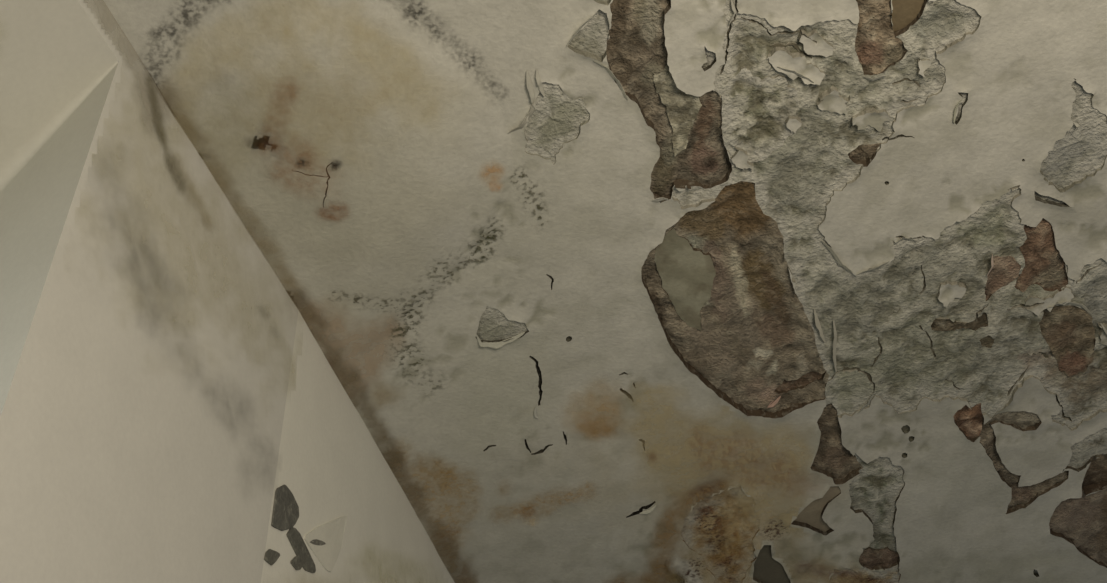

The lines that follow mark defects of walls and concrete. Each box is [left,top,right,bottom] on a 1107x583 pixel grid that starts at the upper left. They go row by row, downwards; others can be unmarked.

peeling [508,69,590,164]
peeling [476,306,529,350]
peeling [594,0,1107,583]
crack [525,356,567,455]
peeling [264,485,326,573]
crack [626,501,656,518]